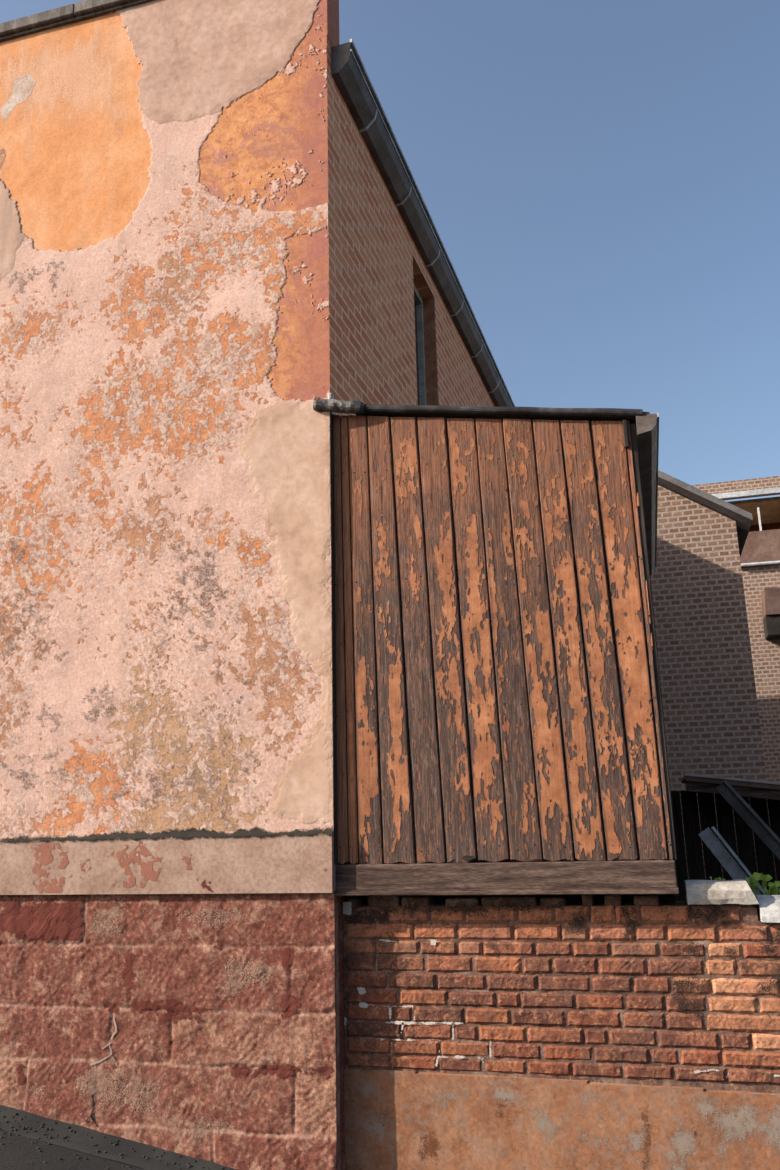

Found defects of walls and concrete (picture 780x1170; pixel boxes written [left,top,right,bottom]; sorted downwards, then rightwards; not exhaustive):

peeling [0,0,330,942]
peeling [334,417,670,862]
crack [85,1095,97,1127]
crack [89,1017,117,1066]